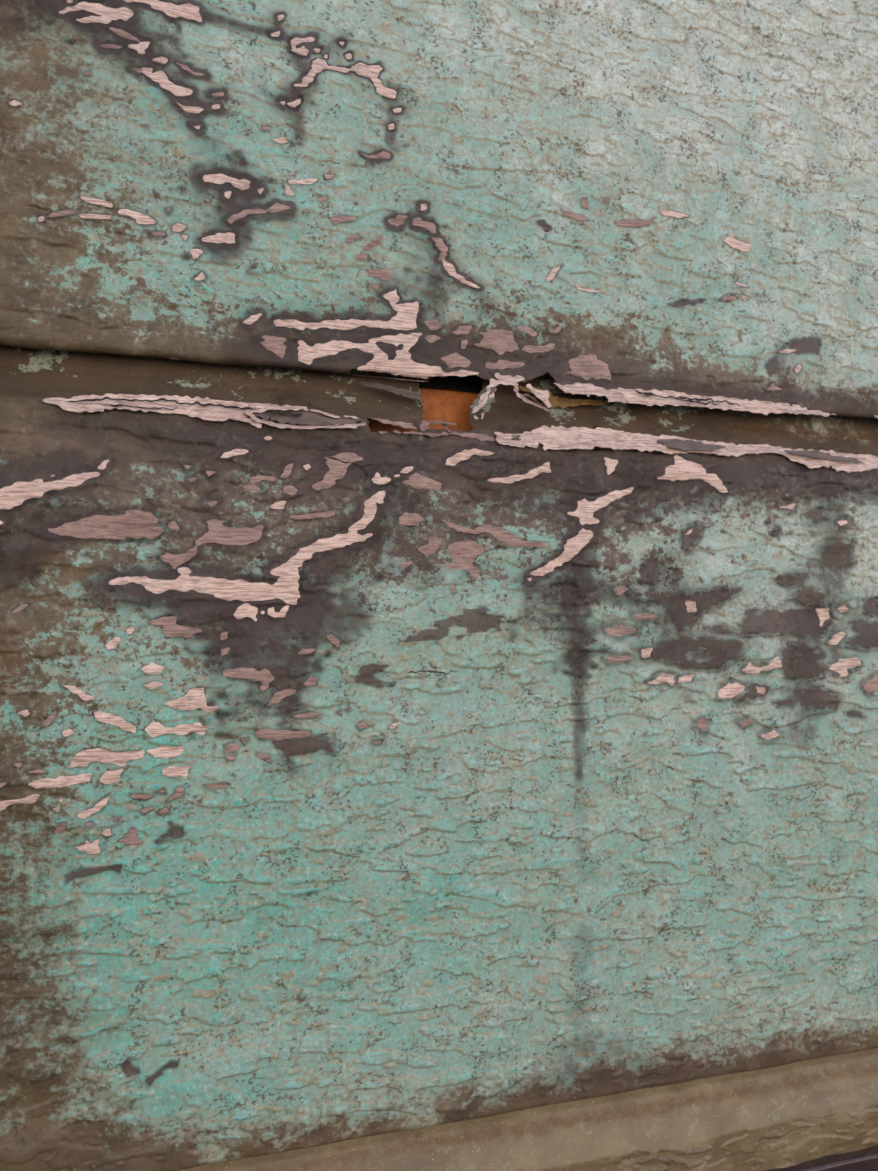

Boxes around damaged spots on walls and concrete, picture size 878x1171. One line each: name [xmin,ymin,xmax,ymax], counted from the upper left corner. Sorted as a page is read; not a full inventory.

peeling [53,0,229,136]
peeling [239,197,836,417]
damp [0,504,83,586]
damp [0,450,85,487]
peeling [0,452,116,535]
peeling [42,393,416,441]
peeling [109,463,442,623]
damp [55,409,878,778]
peeling [400,484,639,588]
peeling [446,425,878,493]
peeling [601,561,878,717]
peeling [0,685,219,854]